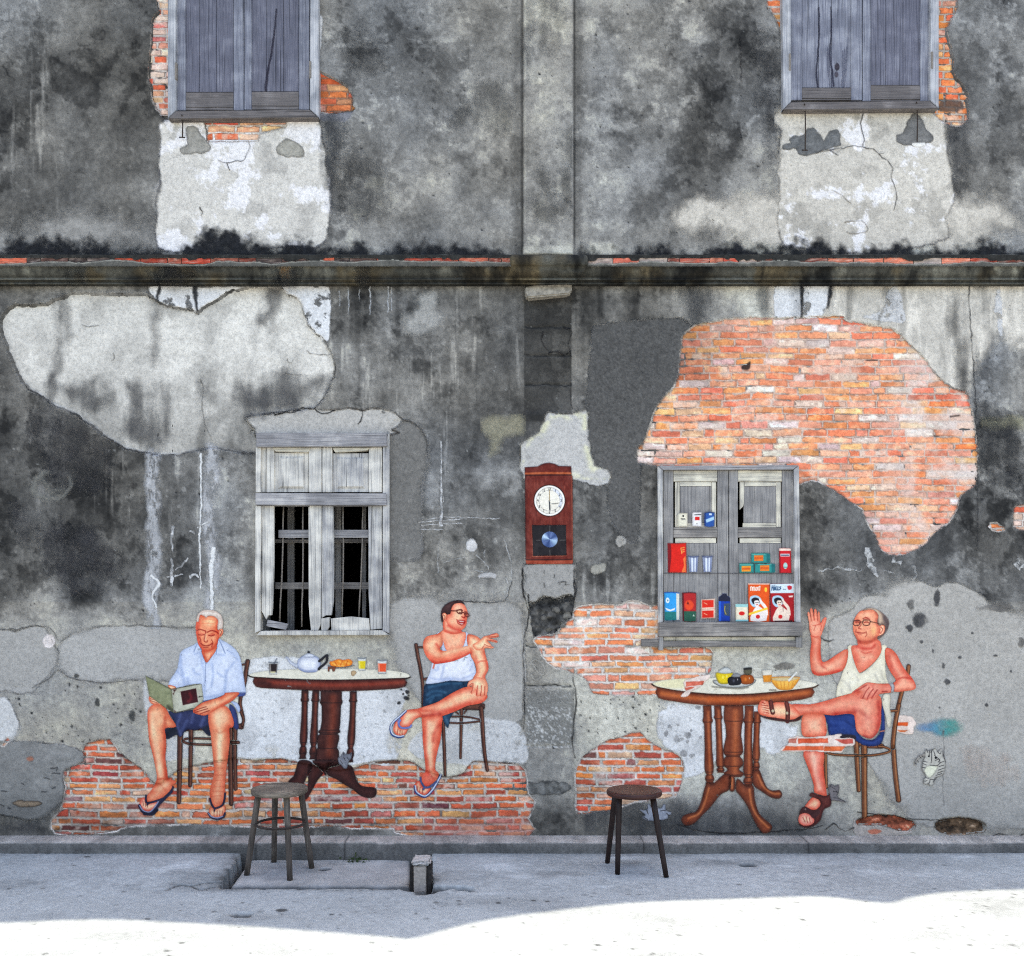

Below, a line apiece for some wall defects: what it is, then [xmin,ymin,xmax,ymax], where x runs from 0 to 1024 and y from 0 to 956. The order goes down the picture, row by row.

leakage [0,215,162,255]
peeling [148,0,355,252]
leakage [182,228,503,255]
crack [818,115,897,205]
peeling [774,0,968,253]
flaking render [3,287,336,455]
flaking render [637,316,978,555]
efflorescence [197,443,220,610]
flaking render [529,583,713,696]
flaking render [51,732,685,835]